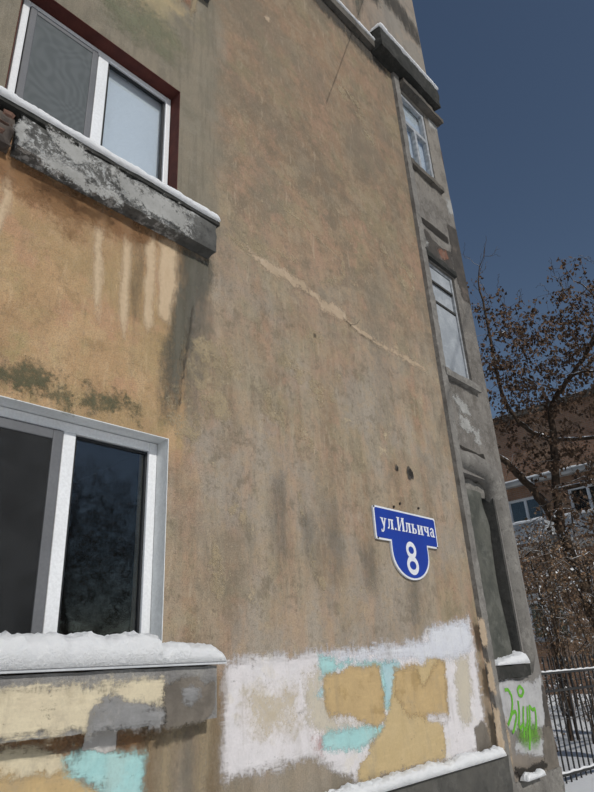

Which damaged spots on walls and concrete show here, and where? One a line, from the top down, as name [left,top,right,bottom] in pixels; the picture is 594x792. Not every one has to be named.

damp [0,176,13,229]
peeling [0,109,194,237]
damp [93,225,105,305]
damp [120,233,212,406]
crack [235,236,426,372]
mould [0,361,139,414]